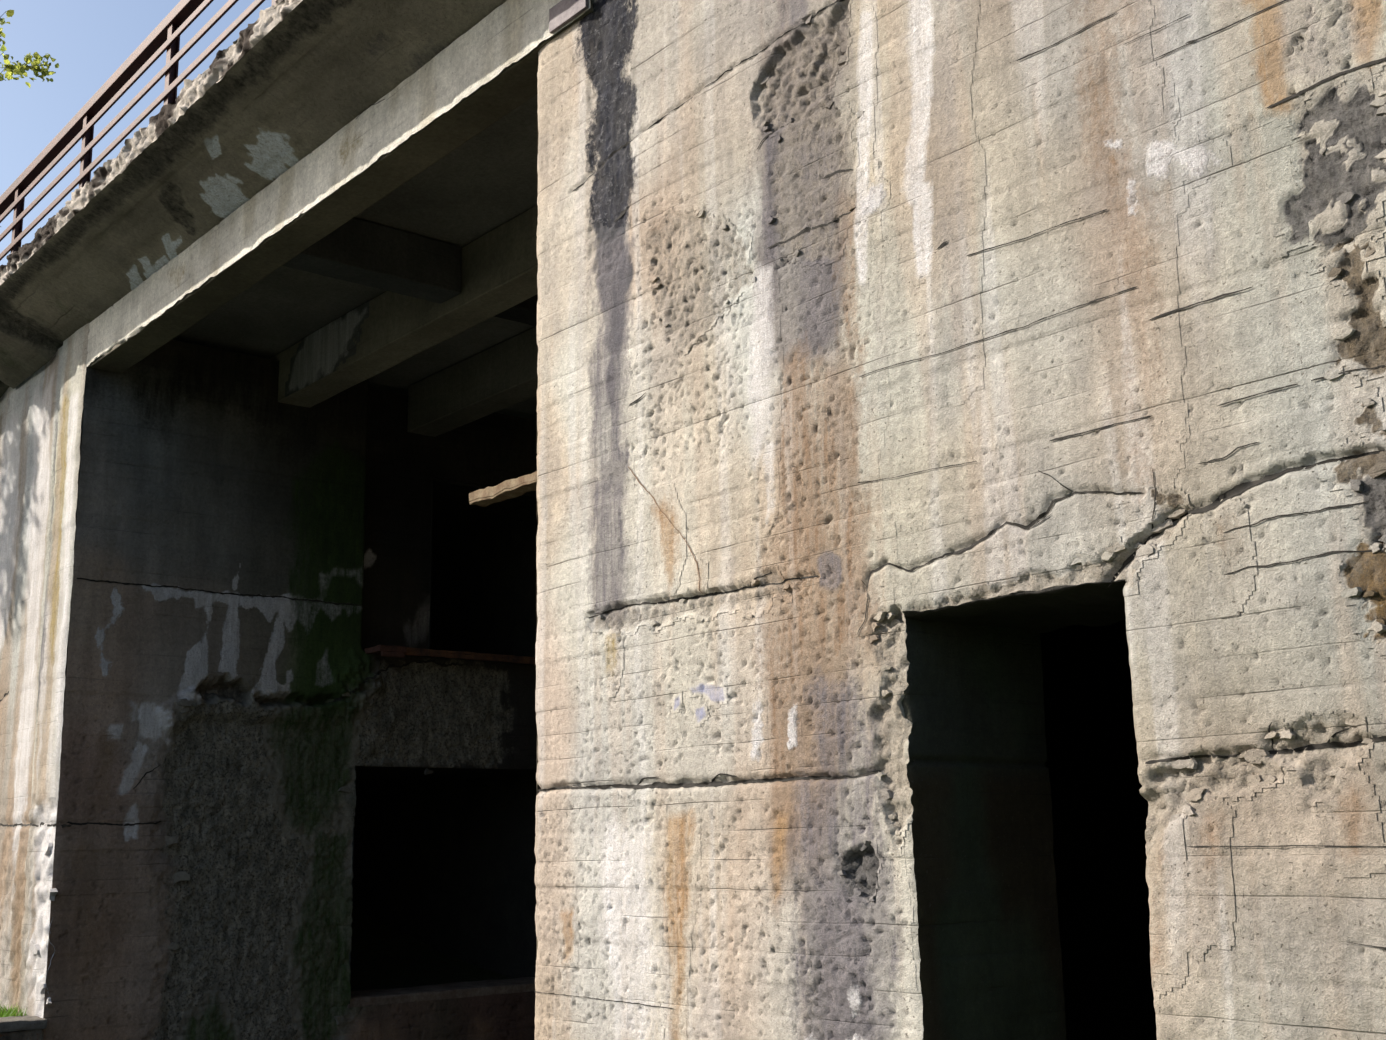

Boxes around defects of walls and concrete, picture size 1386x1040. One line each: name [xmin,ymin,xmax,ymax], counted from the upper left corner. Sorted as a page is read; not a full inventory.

spalling [141,673,310,1040]
water stain [0,0,534,1040]
spalling [357,655,526,775]
water stain [564,0,647,650]
water stain [737,0,986,535]
crack [857,416,1386,634]
rust [1229,0,1305,132]
peeling [1273,63,1386,656]